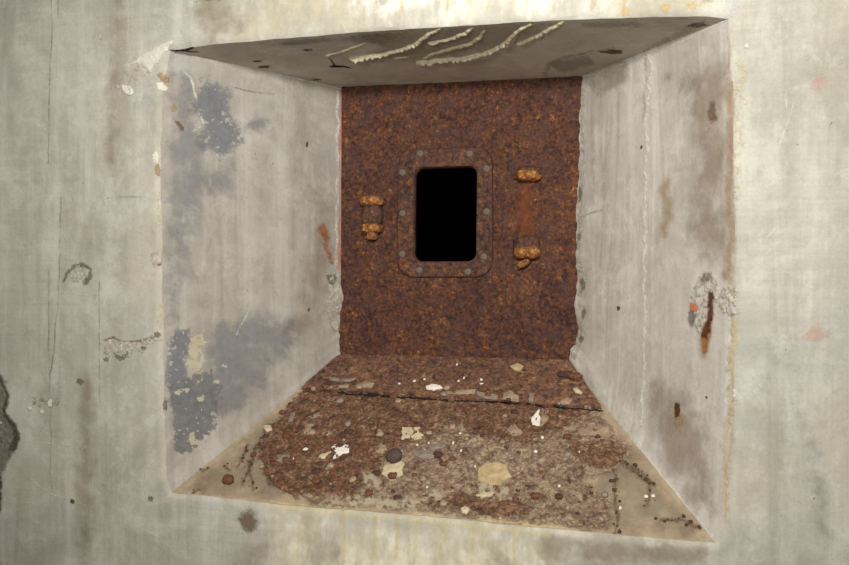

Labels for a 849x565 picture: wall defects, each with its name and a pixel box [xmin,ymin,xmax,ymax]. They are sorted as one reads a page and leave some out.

spalling [152,151,160,176]
damp [171,83,243,215]
corrosion [318,225,332,264]
spalling [63,262,92,284]
spalling [103,332,161,361]
peeling [163,322,289,454]
crack [320,390,603,411]
spalling [0,374,20,510]